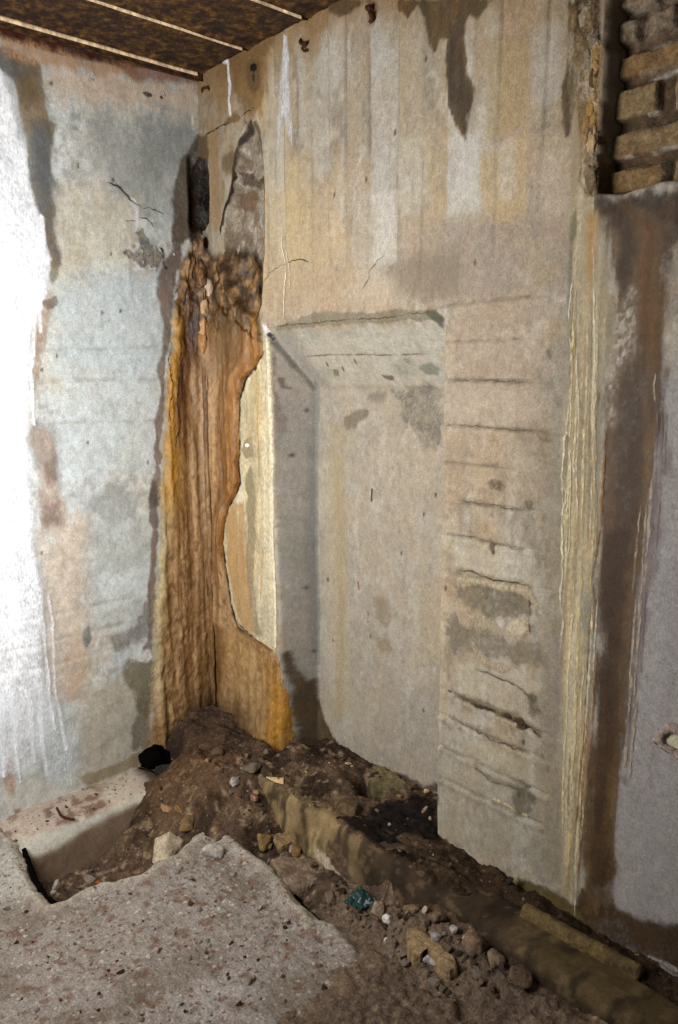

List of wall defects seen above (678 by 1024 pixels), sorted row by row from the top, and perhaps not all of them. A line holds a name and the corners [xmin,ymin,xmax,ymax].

leakage [398,0,487,135]
crack [108,182,167,269]
peeling [123,228,175,268]
spalling [189,120,265,316]
leakage [0,47,199,784]
leakage [223,231,444,745]
leakage [514,158,678,974]
crack [448,671,540,750]